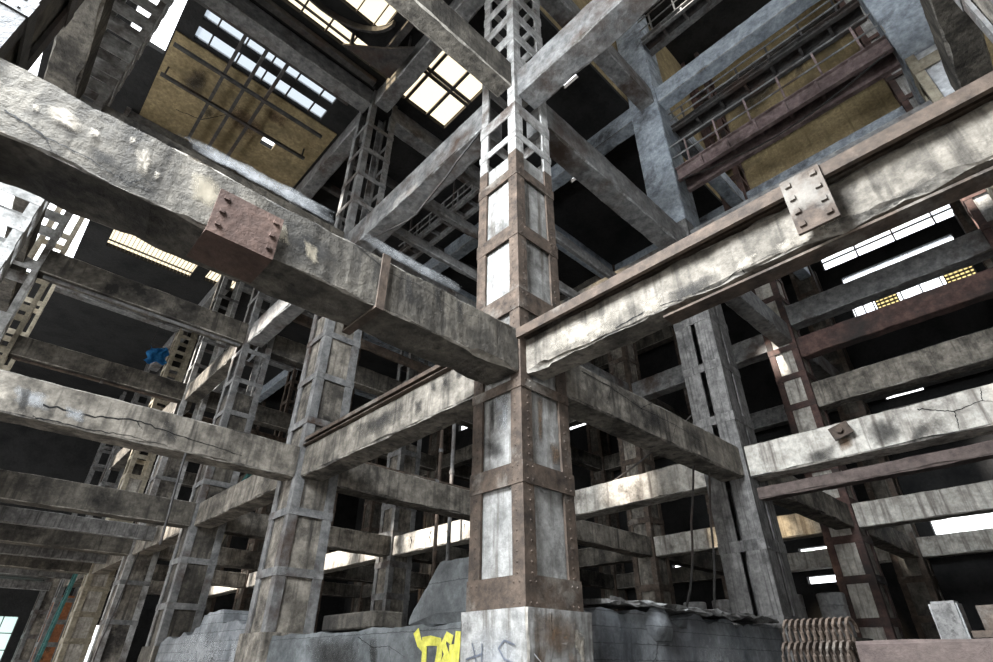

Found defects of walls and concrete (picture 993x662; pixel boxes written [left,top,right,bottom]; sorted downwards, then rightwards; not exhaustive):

rust [197,179,218,202]